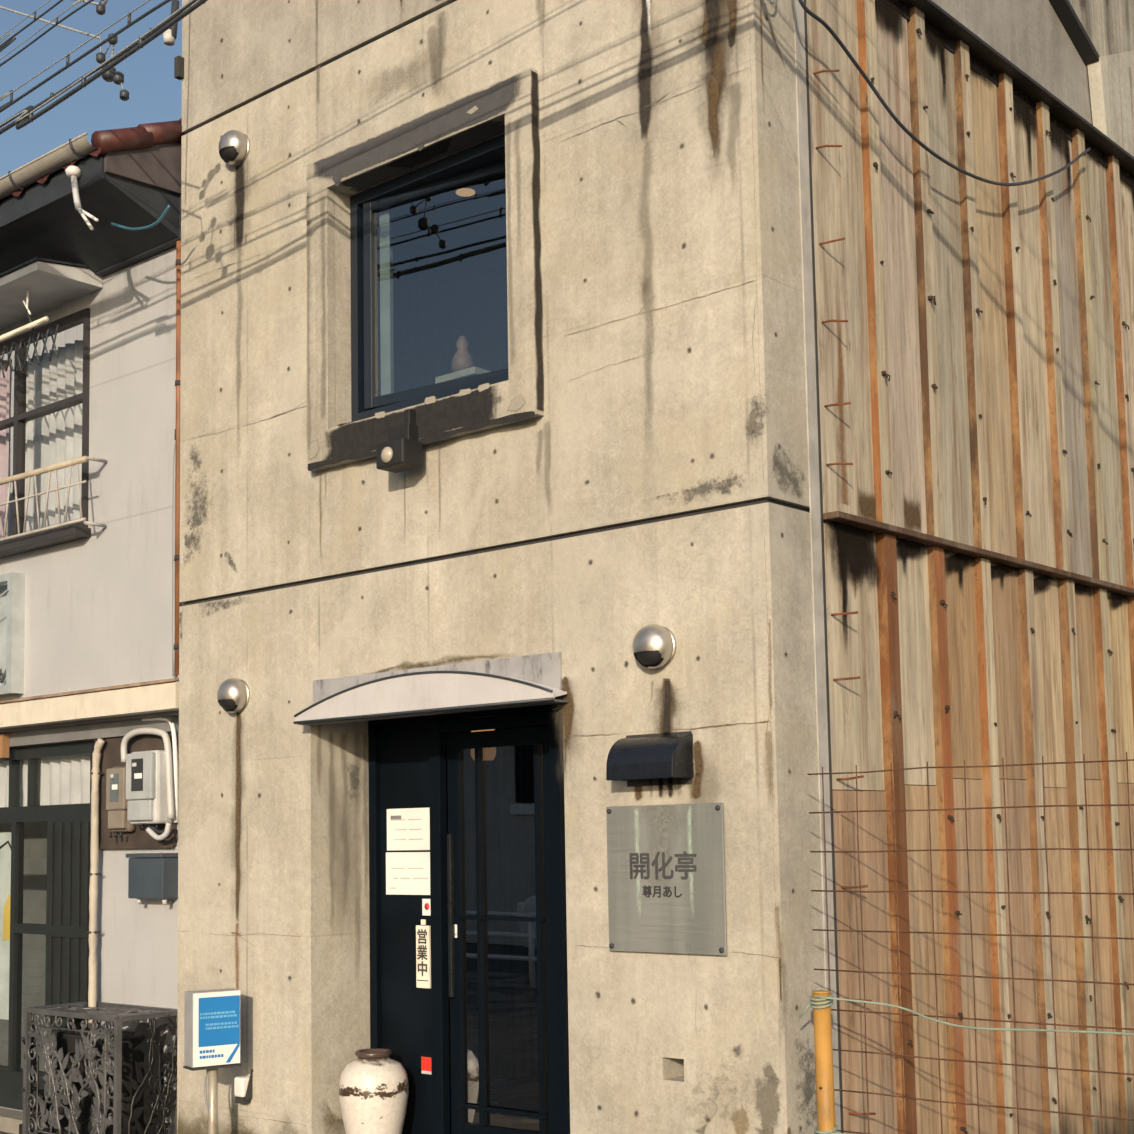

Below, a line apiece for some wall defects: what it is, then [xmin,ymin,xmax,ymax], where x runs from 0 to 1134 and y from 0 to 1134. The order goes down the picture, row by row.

leakage [638,0,652,136]
leakage [235,163,244,244]
rust [838,335,876,519]
rust [904,499,921,529]
leakage [827,520,879,634]
leakage [896,539,926,571]
leakage [945,553,976,584]
leakage [990,564,1020,586]
rust [659,678,675,736]
rust [691,741,703,798]
spalling [731,1066,780,1134]
spalling [798,1050,817,1124]